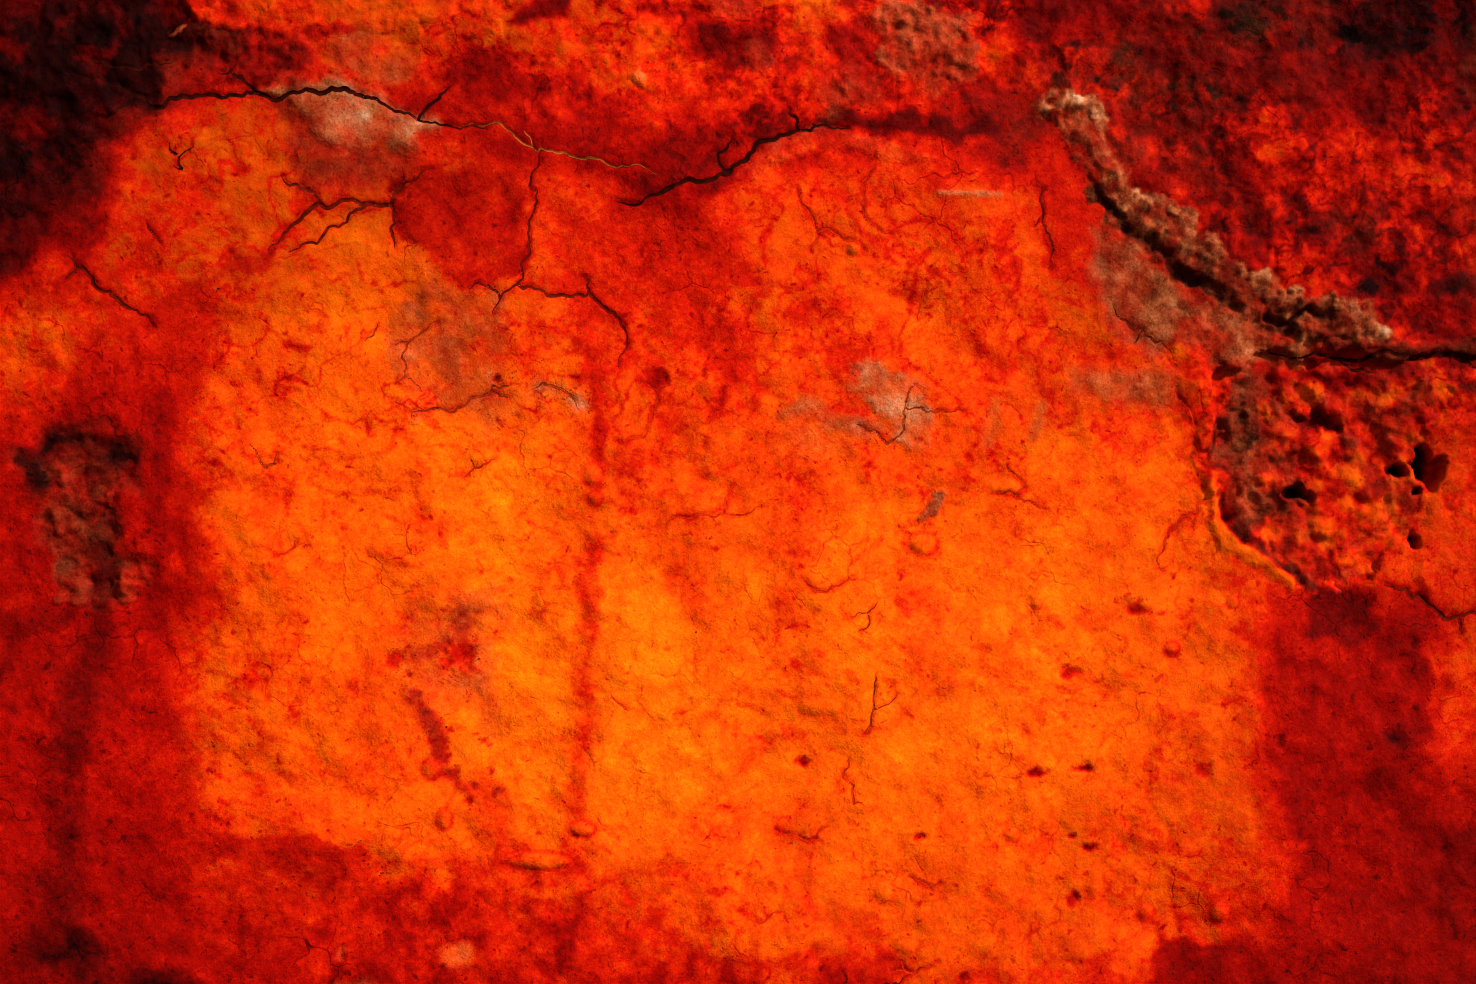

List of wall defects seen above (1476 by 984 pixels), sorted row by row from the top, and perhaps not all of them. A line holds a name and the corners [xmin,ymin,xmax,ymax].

crack [66,59,891,443]
spalling [1190,346,1476,618]
crack [1259,338,1476,373]